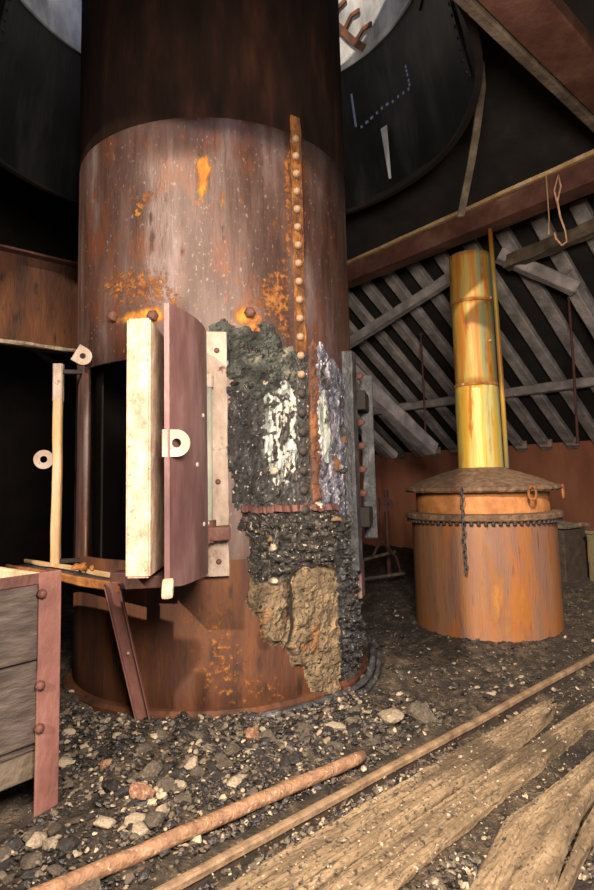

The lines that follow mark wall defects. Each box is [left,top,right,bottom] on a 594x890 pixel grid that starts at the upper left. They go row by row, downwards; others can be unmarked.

corrosion [197,151,212,198]
corrosion [105,267,177,322]
corrosion [235,150,293,338]
peeling [209,314,298,497]
peeling [315,341,349,522]
corrosion [190,610,283,703]
peeling [245,558,343,694]